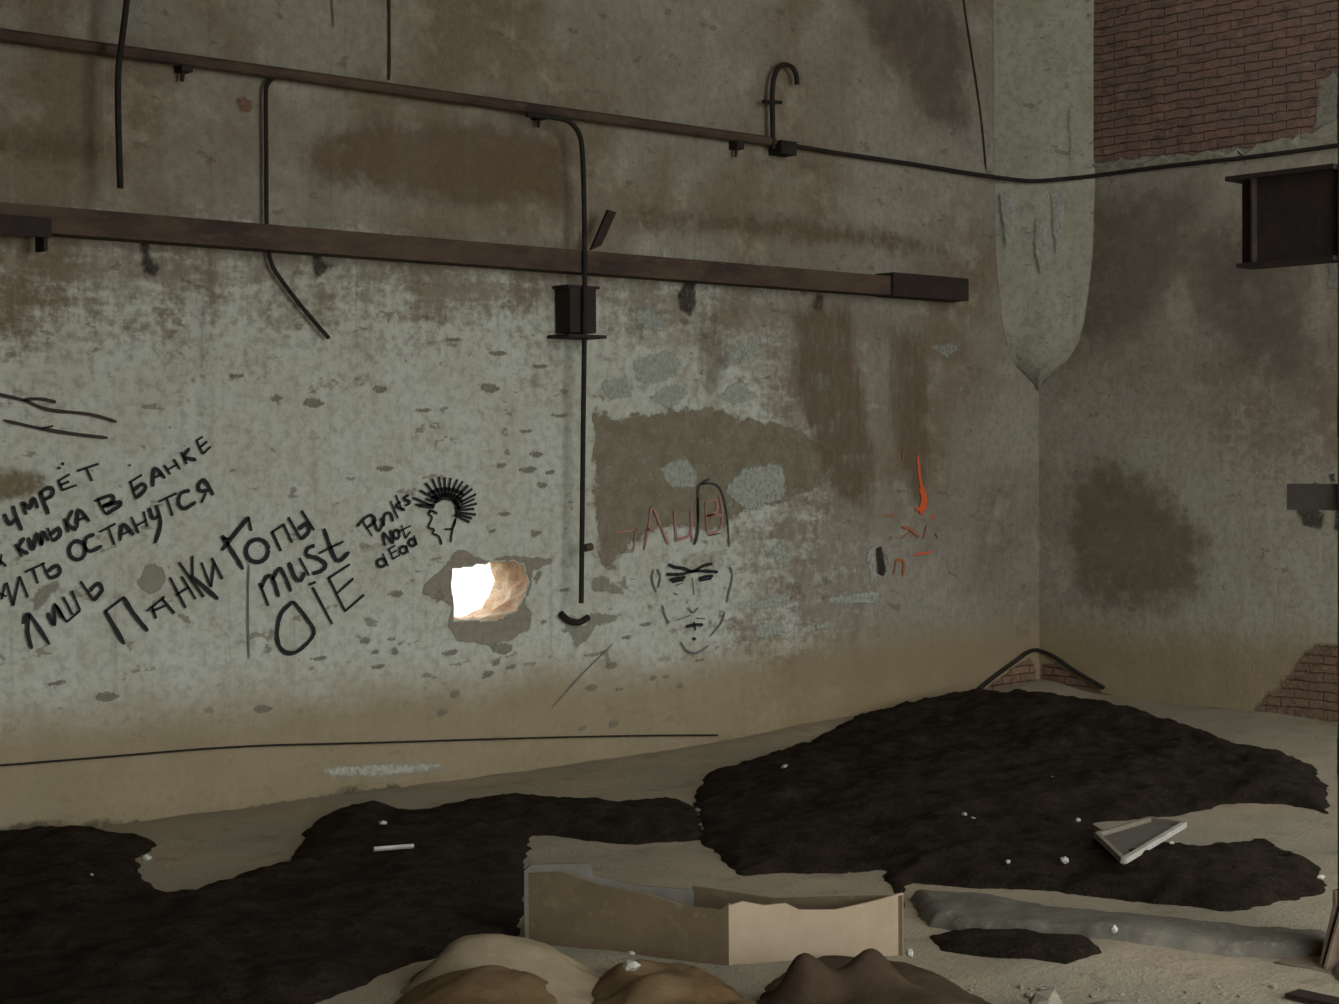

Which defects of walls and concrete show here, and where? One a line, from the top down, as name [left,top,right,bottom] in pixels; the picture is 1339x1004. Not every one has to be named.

flaking render [1092,0,1338,171]
spalling [678,283,696,316]
peeling [304,398,324,408]
peeling [481,384,500,393]
peeling [498,451,555,488]
peeling [591,351,833,594]
peeling [827,546,886,605]
peeling [360,637,398,669]
spalling [422,550,551,679]
peeling [562,613,620,669]
peeling [96,692,119,702]
flaking render [1256,644,1338,722]